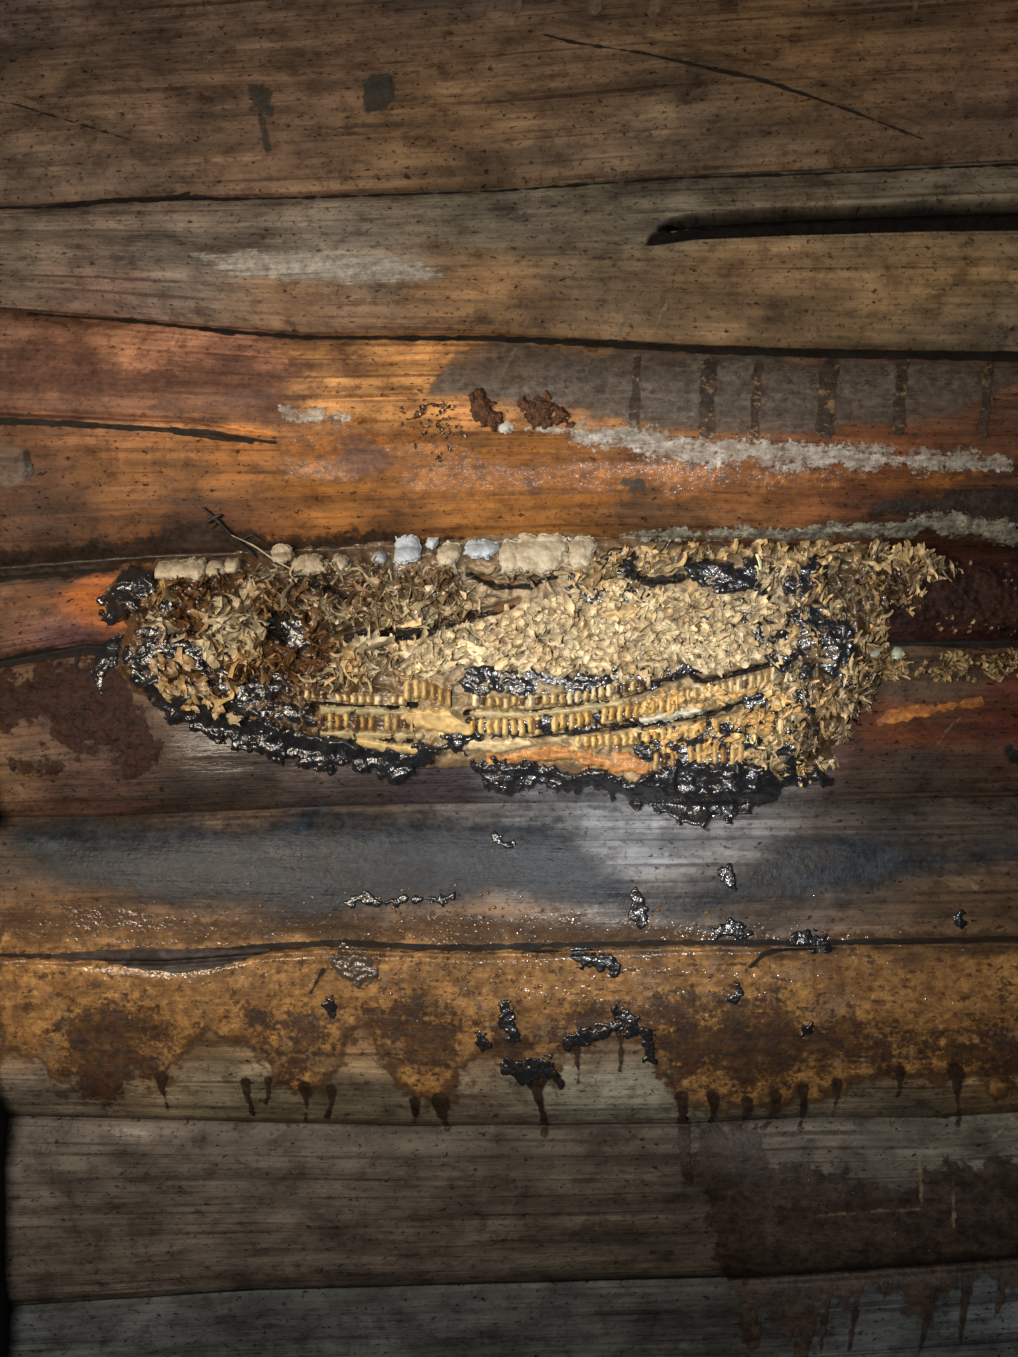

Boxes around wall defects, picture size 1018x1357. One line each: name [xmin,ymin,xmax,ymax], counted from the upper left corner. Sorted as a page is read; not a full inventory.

crack [0,30,1018,209]
crack [646,206,1018,246]
crack [0,417,276,479]
leakage [0,340,1018,547]
leakage [0,522,399,583]
leakage [0,900,1018,1357]